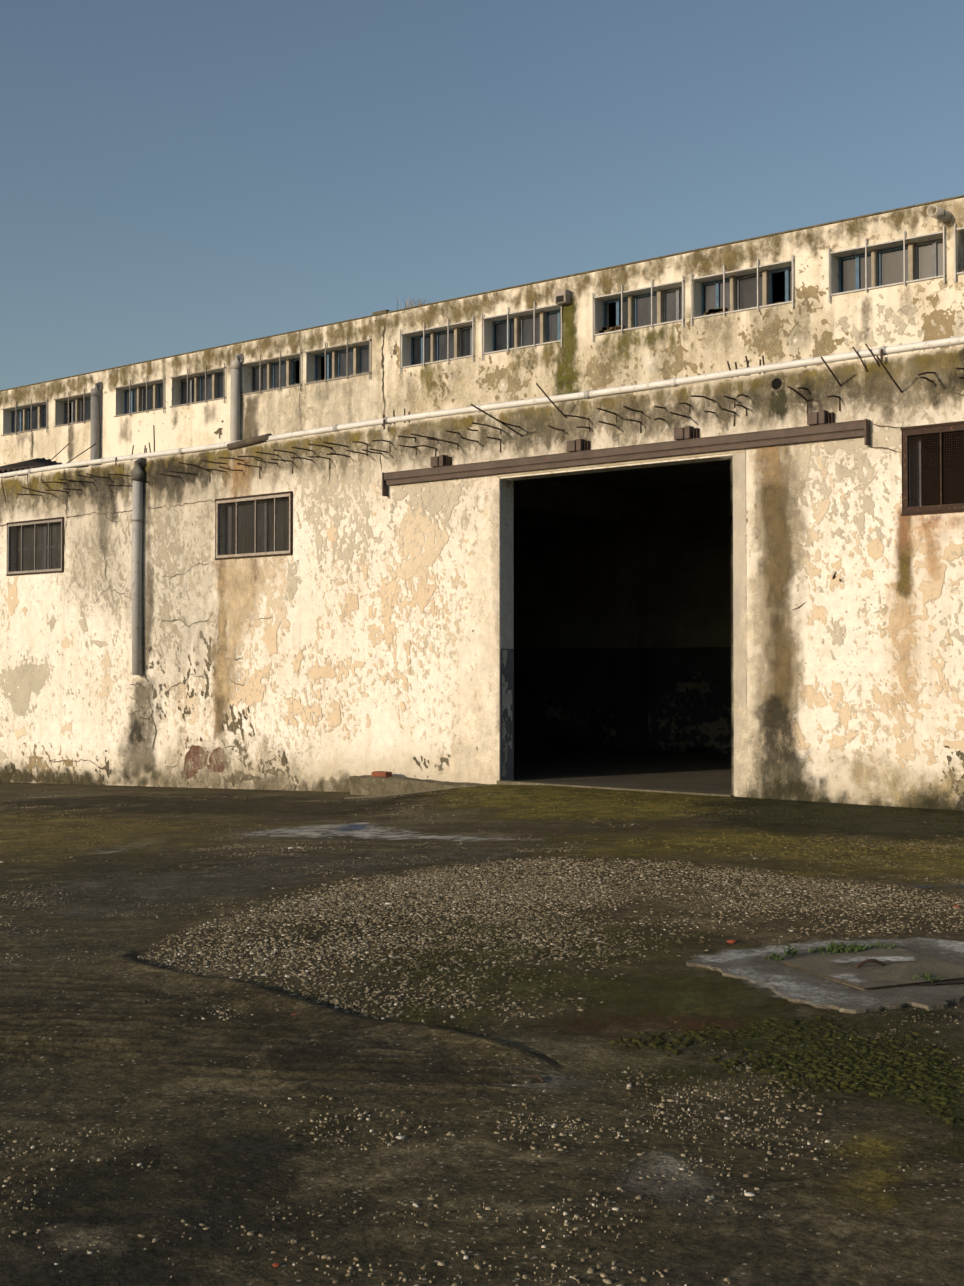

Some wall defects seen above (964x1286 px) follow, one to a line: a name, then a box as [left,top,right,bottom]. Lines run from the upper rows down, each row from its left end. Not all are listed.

leakage [63,427,133,567]
leakage [119,565,155,779]
leakage [146,456,208,548]
leakage [213,559,254,737]
peeling [0,257,964,811]
leakage [740,445,806,799]
leakage [4,790,447,815]